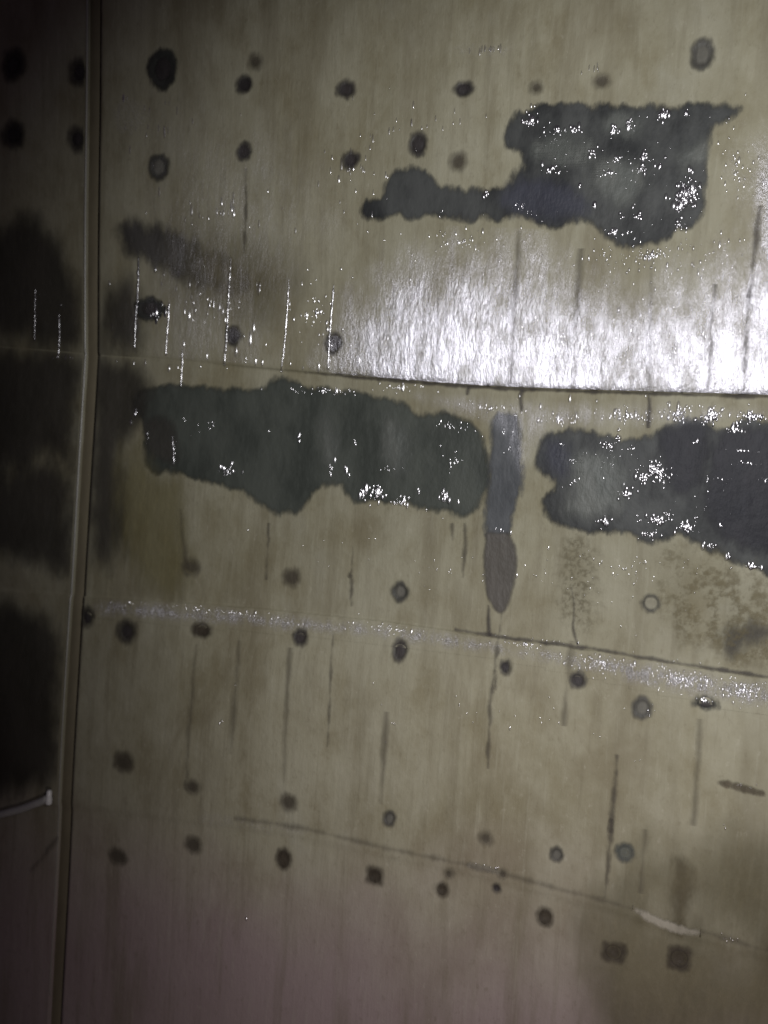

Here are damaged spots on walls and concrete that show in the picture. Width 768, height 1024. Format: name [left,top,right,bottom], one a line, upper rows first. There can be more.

damp [362,102,739,247]
damp [122,221,273,296]
damp [0,218,80,571]
damp [91,363,523,612]
damp [536,418,768,577]
damp [0,605,57,792]
crack [455,612,668,662]
crack [701,666,754,675]